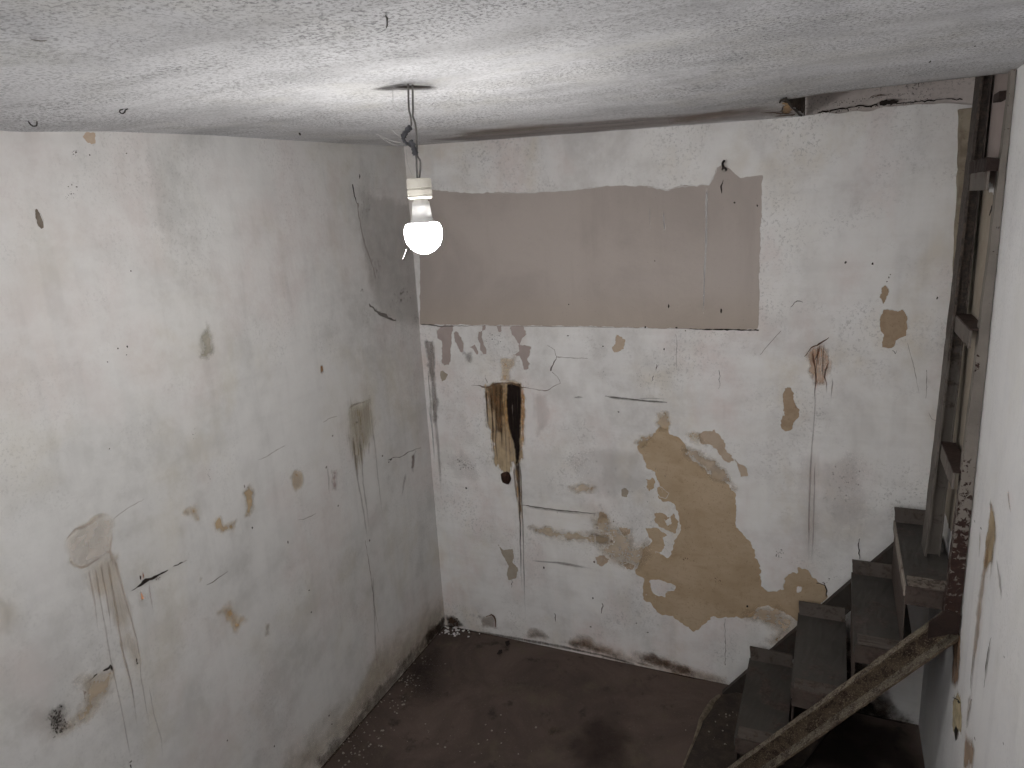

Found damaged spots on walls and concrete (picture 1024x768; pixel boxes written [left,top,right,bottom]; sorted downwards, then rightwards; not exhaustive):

crack [818,98,963,113]
flaking render [394,165,763,381]
peeling [879,274,908,354]
crack [475,346,588,391]
corrosion [804,337,829,393]
peeling [781,387,800,431]
corrosion [484,383,525,568]
peeling [535,511,631,567]
peeling [623,414,828,632]
crack [132,560,186,599]